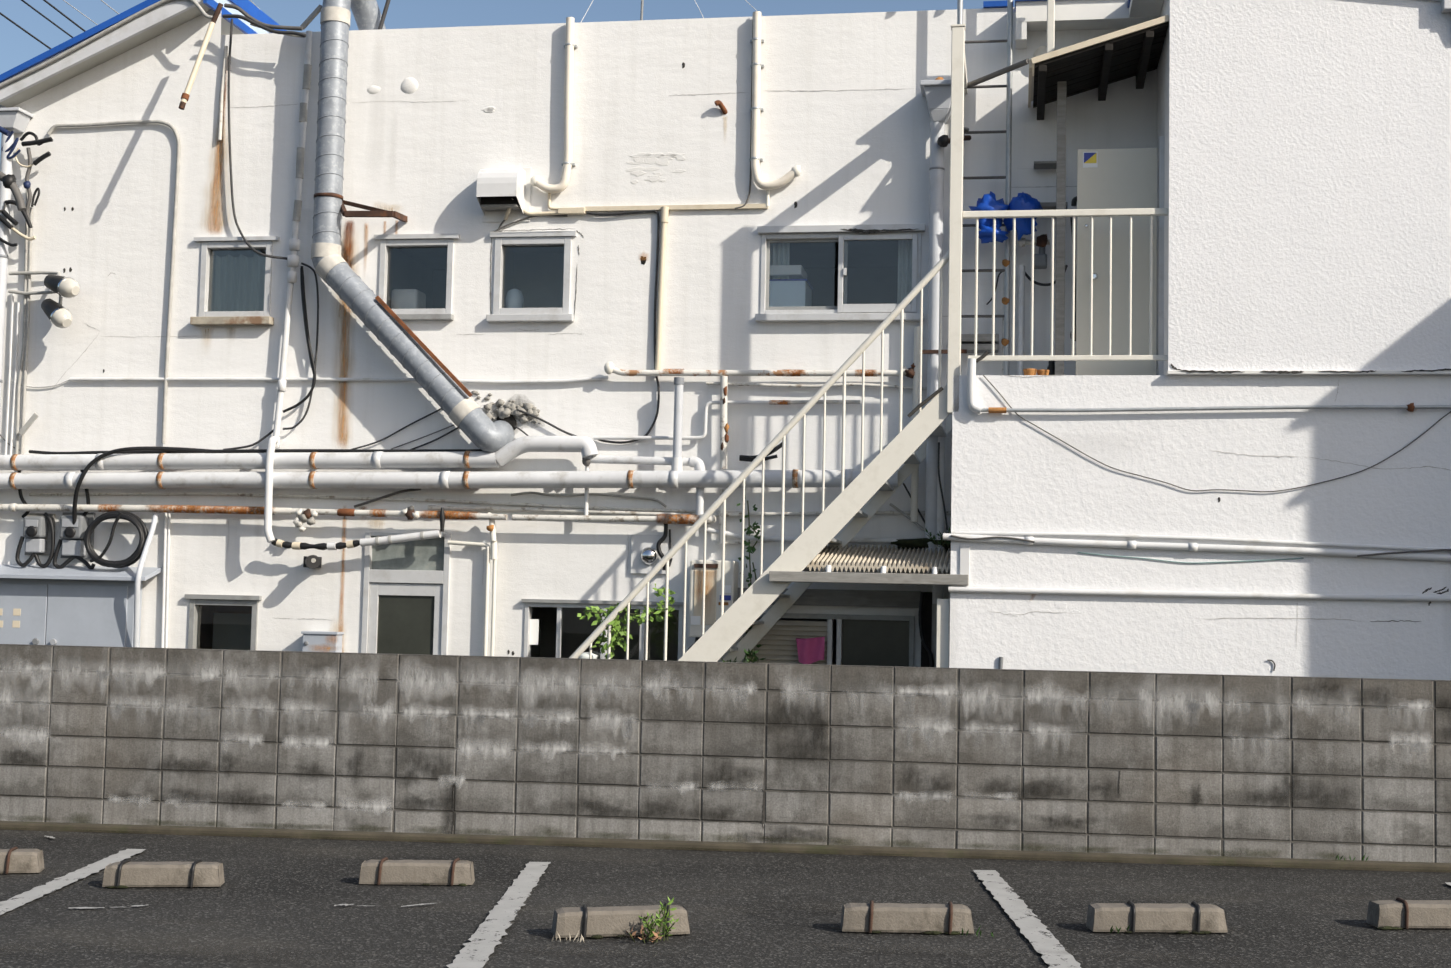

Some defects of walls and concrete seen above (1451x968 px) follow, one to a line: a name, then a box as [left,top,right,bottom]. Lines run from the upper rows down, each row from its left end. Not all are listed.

rust [214,46,228,225]
rust [344,222,386,262]
crack [1216,451,1451,471]
water stain [99,667,164,680]
water stain [202,669,237,682]
water stain [367,674,576,722]
water stain [900,688,998,705]
water stain [1142,691,1217,709]
water stain [285,738,329,746]
water stain [461,743,506,756]
water stain [527,745,624,757]
water stain [900,773,948,798]